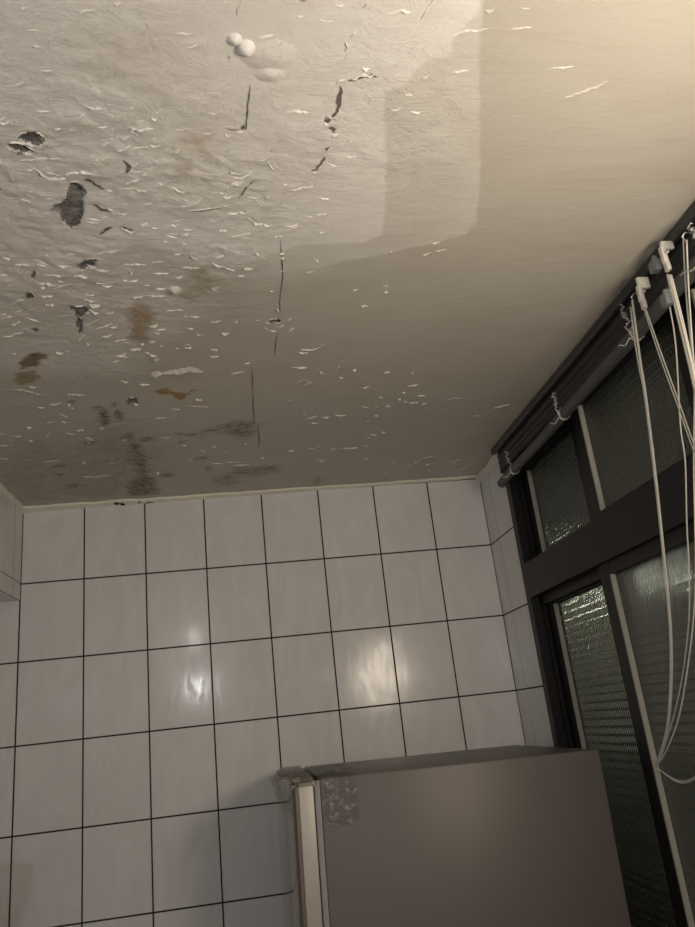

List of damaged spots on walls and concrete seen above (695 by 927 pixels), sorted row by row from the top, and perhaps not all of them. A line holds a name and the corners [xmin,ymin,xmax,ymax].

peeling [99,118,162,152]
crack [226,88,251,131]
peeling [323,111,341,138]
crack [327,74,377,122]
spalling [5,132,127,232]
peeling [181,138,281,238]
peeling [121,220,200,307]
peeling [1,250,204,386]
corrosion [15,354,46,385]